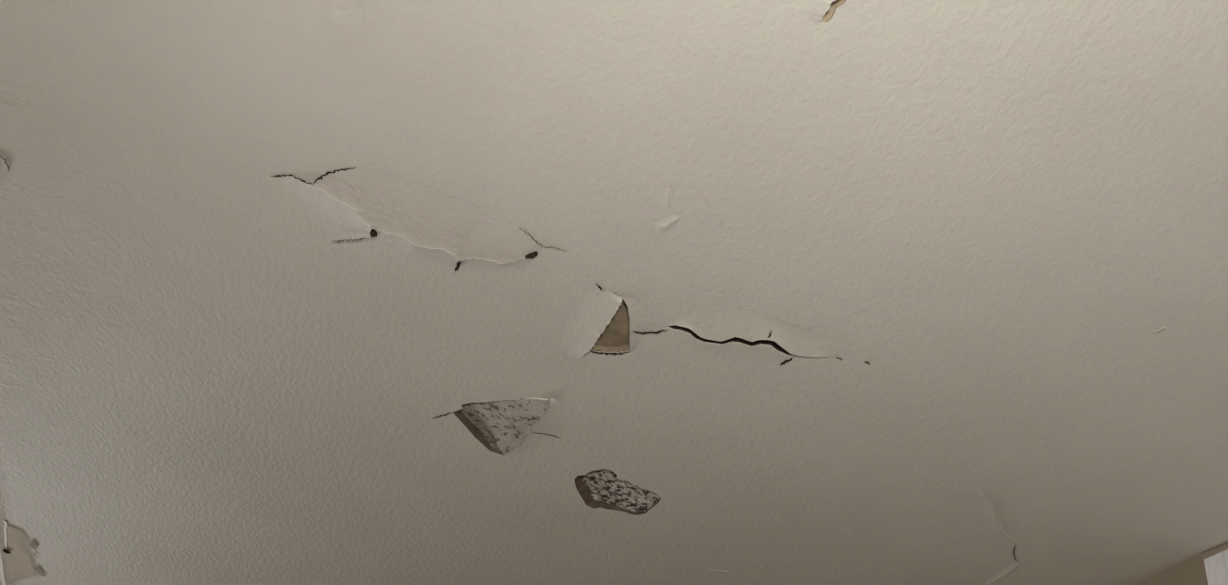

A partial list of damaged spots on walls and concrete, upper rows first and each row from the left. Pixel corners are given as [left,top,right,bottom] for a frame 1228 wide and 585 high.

peeling [785,0,846,25]
peeling [271,167,566,280]
peeling [560,283,654,362]
crack [632,307,870,366]
spalling [432,398,574,459]
spalling [575,469,661,515]
peeling [3,519,45,581]